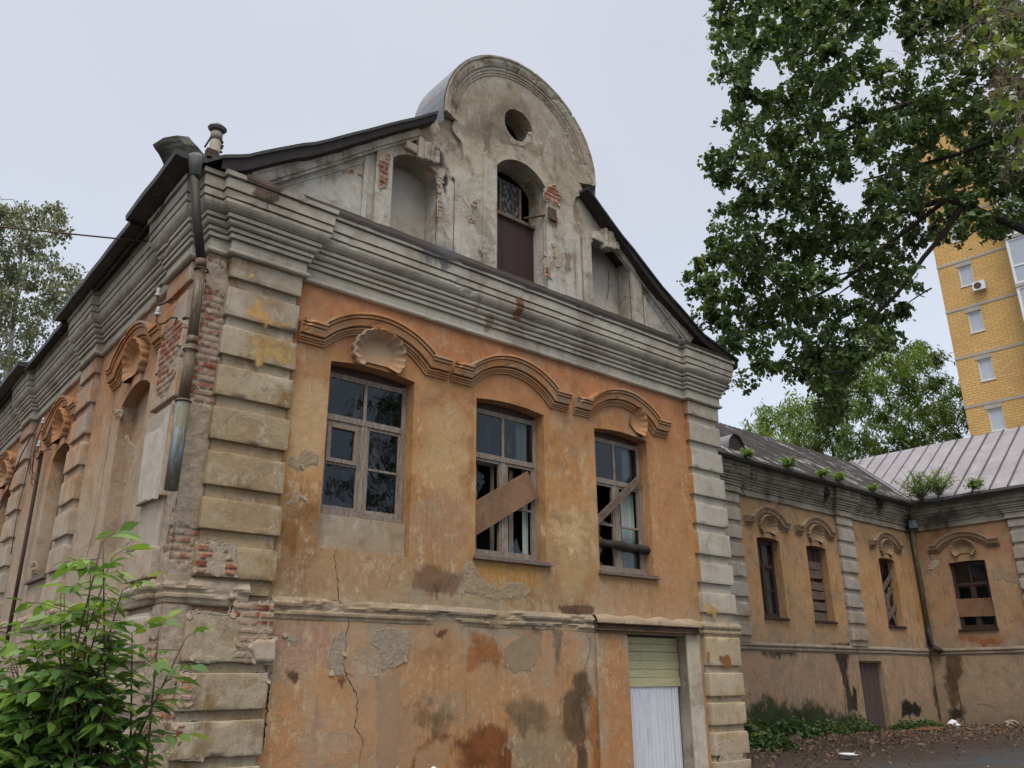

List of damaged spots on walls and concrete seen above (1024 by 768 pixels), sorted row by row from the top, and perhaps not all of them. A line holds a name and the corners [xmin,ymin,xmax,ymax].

crack [333,543,364,767]